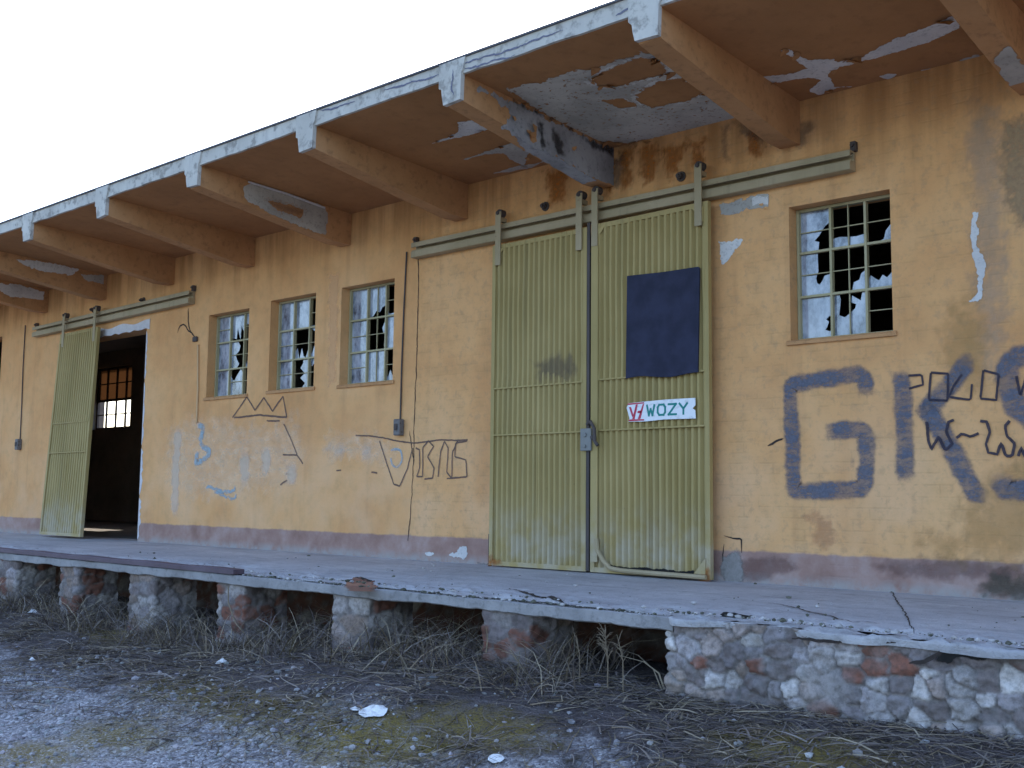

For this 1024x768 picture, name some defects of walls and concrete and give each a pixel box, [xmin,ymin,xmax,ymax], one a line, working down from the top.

peeling [764,17,960,95]
peeling [994,46,1024,86]
peeling [432,120,488,144]
peeling [464,51,734,186]
spalling [243,181,328,235]
rust [549,171,567,202]
rust [609,145,704,192]
peeling [719,194,769,215]
spalling [18,260,104,284]
peeling [719,238,743,265]
flaking render [969,212,986,302]
crack [773,592,914,644]